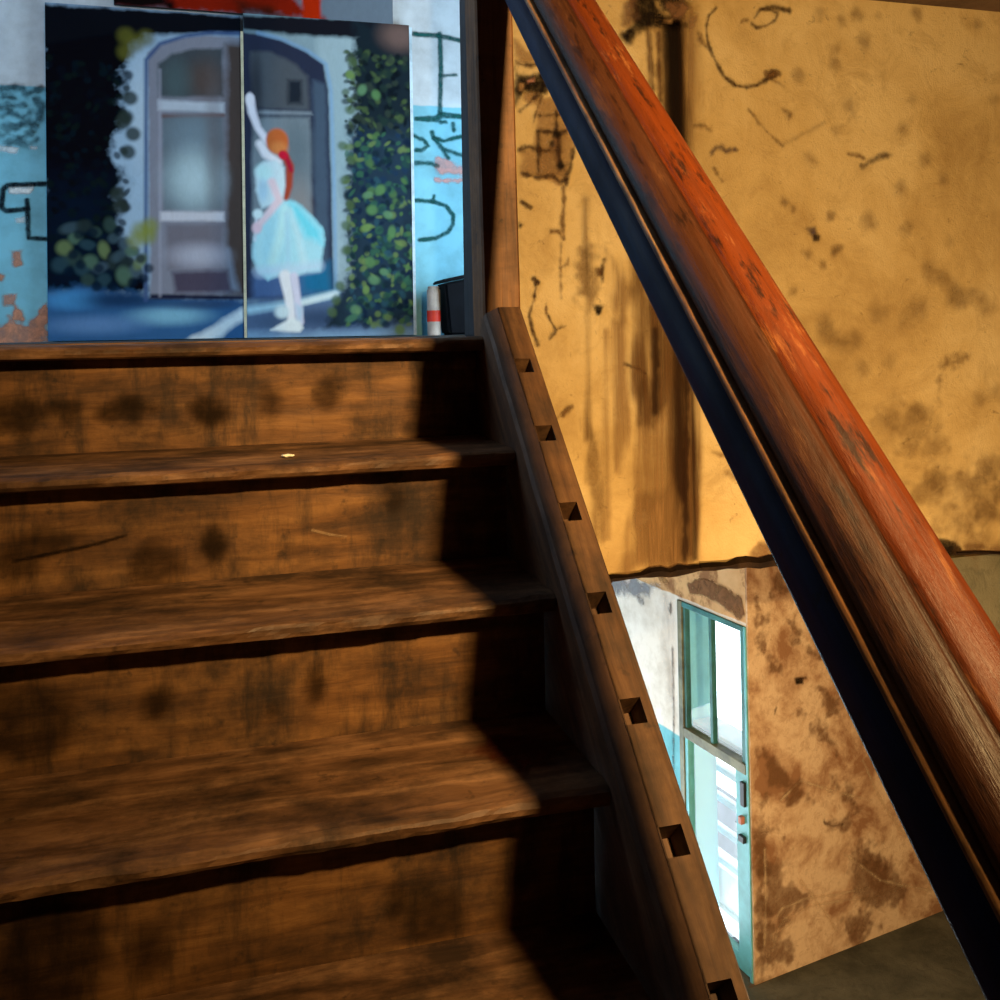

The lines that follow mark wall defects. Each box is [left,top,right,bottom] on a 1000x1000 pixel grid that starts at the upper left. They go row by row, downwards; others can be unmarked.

water stain [647,10,694,143]
peeling [13,251,22,267]
peeling [0,295,48,343]
water stain [612,276,700,596]